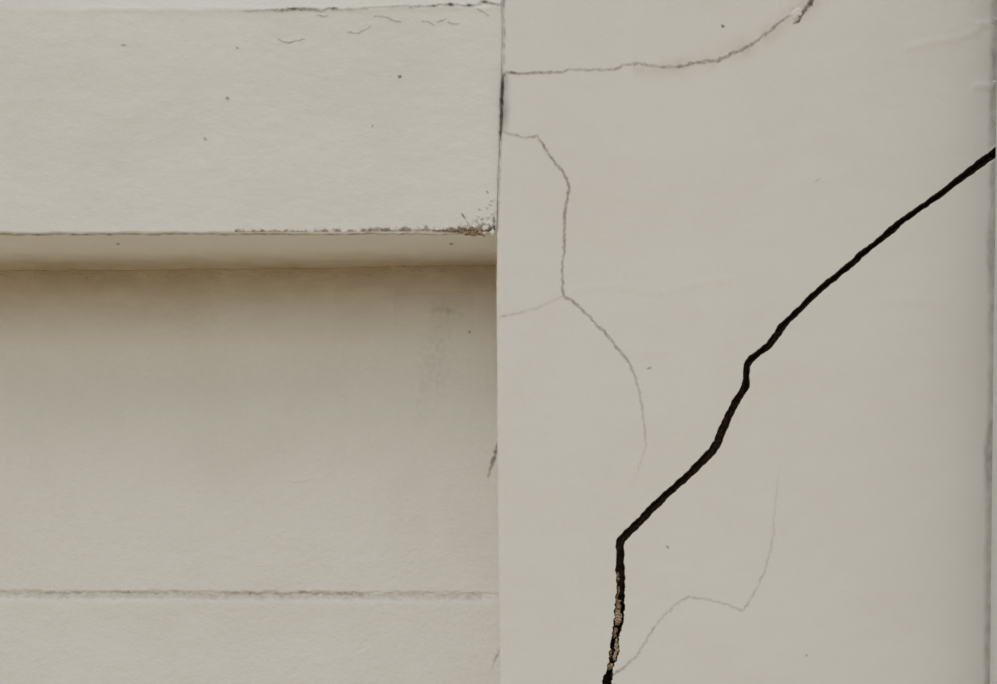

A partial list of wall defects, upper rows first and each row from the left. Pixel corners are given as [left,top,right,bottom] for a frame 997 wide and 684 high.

crack [602,147,996,684]